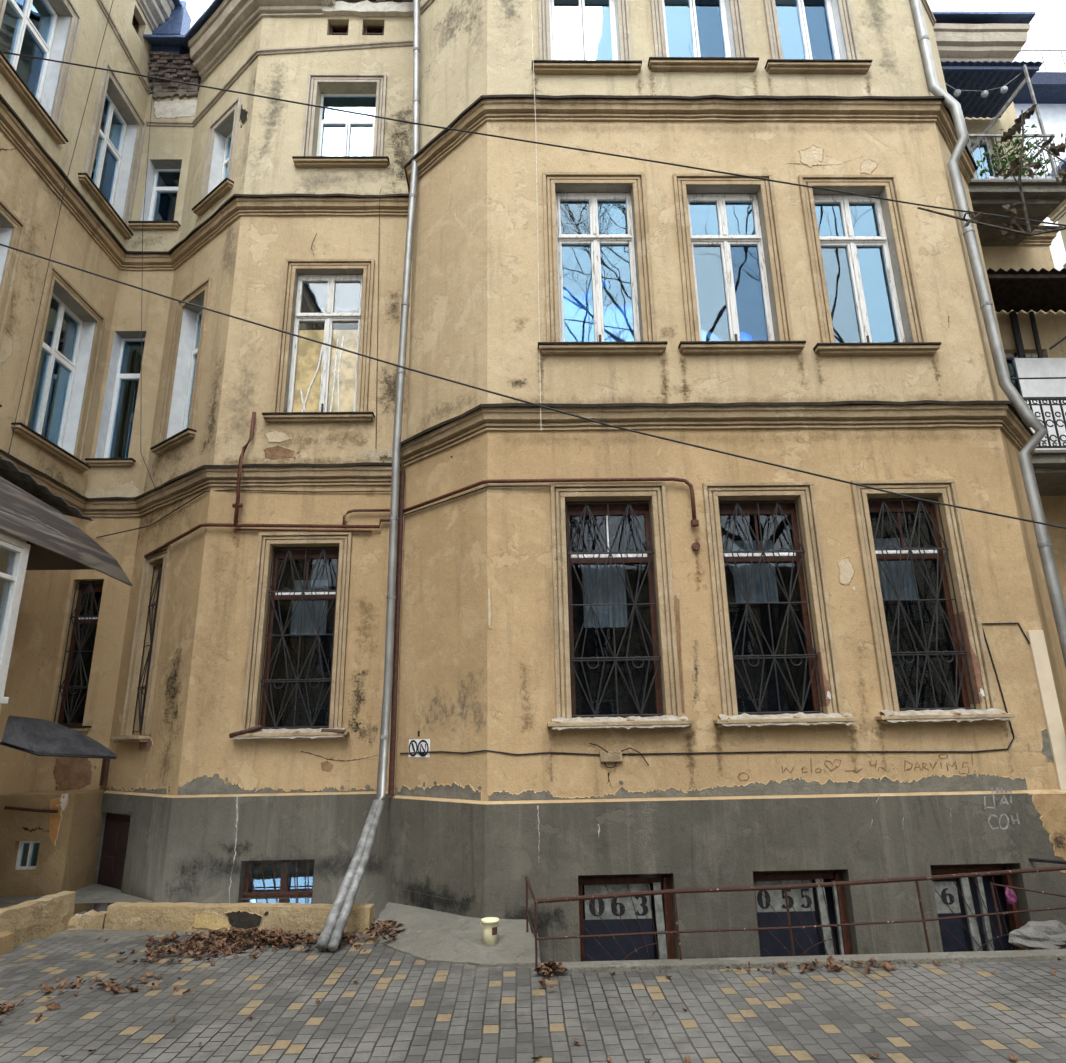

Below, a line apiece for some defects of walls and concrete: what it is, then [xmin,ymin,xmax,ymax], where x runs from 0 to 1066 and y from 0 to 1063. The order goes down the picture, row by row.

peeling [263,429,300,460]
peeling [837,556,855,590]
water stain [163,649,183,731]
water stain [348,670,377,742]
crack [229,797,238,903]
peeling [395,772,1066,873]
flaking render [189,910,268,931]